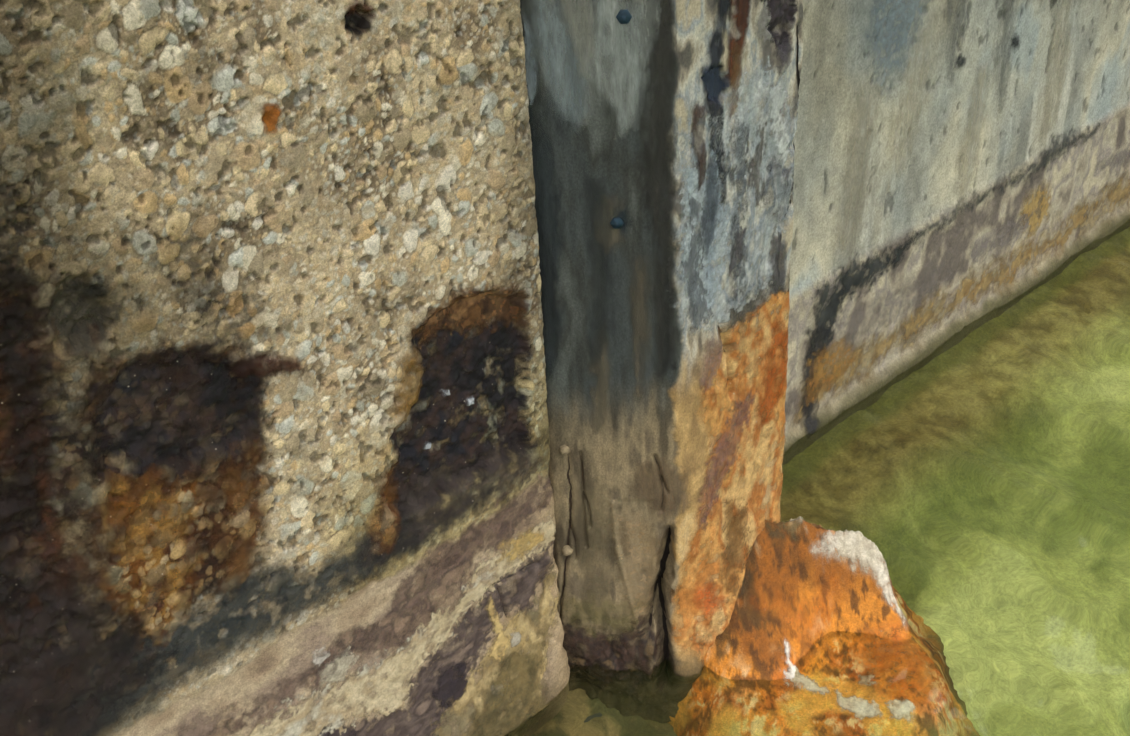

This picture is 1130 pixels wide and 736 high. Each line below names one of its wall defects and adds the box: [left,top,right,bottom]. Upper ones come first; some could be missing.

damp [524,0,798,372]
rust [726,0,751,88]
damp [802,69,1100,434]
rust [0,267,303,736]
crack [559,452,589,617]
crack [649,456,671,660]
rust [672,290,790,661]